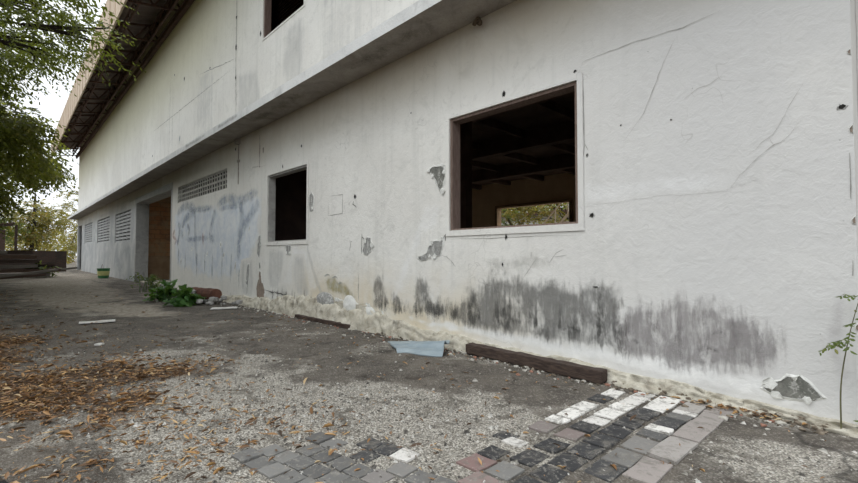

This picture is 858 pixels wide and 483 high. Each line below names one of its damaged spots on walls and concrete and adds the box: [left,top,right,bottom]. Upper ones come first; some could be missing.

crack [578,12,716,139]
spalling [426,163,446,196]
spalling [417,236,444,262]
damp [374,201,805,408]
spalling [760,373,827,405]